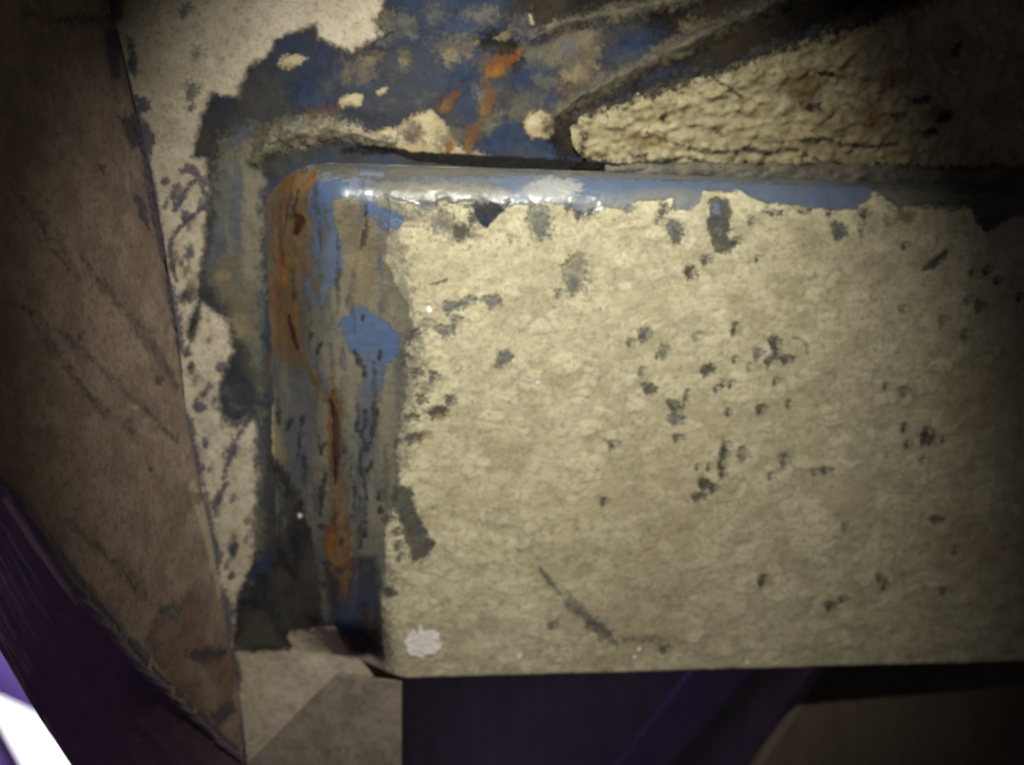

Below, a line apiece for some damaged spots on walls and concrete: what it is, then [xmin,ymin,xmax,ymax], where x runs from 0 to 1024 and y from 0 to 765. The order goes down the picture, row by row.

peeling [121,95,166,258]
corrosion [437,85,465,114]
corrosion [446,47,523,154]
corrosion [265,166,356,600]
peeling [165,0,1024,690]